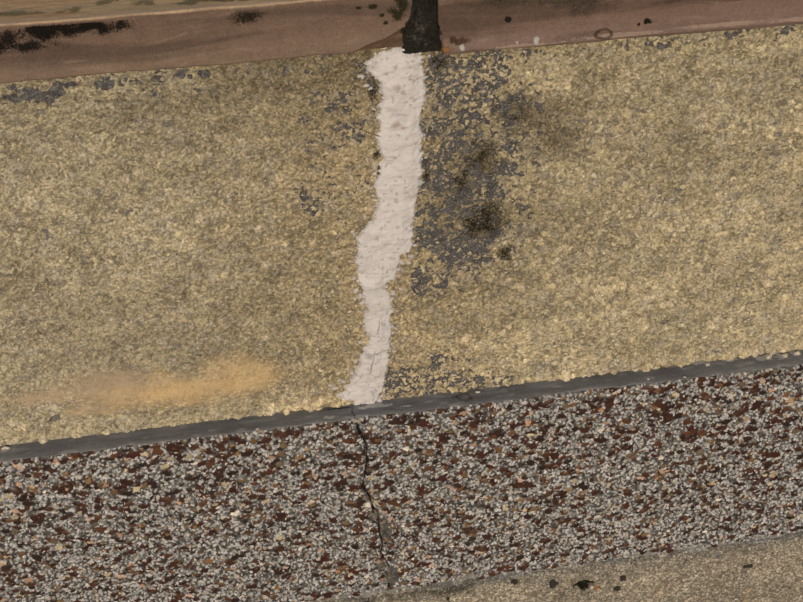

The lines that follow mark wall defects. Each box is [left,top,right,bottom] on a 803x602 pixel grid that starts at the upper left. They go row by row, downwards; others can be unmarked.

damp [0,20,130,54]
damp [449,143,498,197]
damp [463,202,509,238]
crack [328,406,389,588]